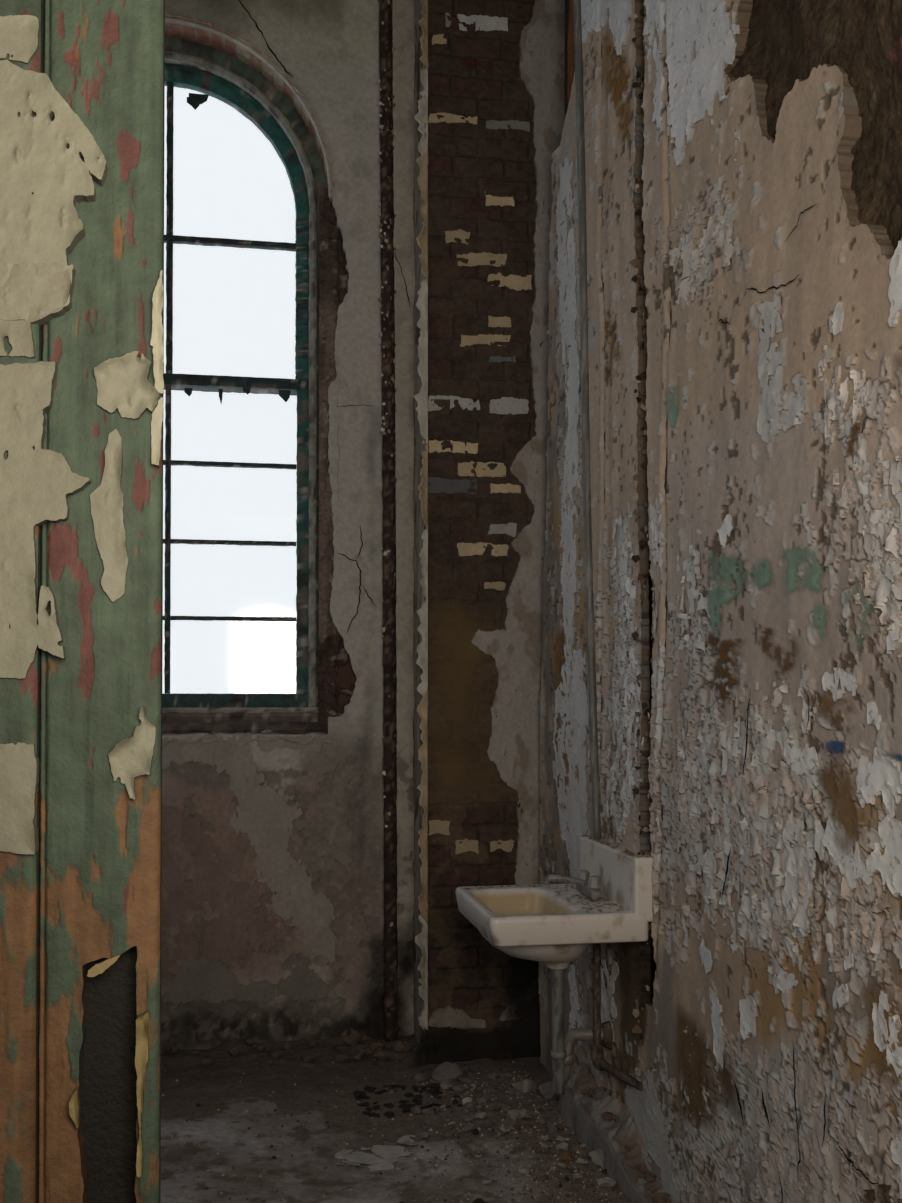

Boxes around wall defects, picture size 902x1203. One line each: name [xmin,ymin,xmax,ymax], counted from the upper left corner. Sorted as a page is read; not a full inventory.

crack [238,0,294,78]
peeling [0,15,164,679]
peeling [379,173,397,457]
peeling [108,196,356,963]
crack [336,527,377,634]
peeling [413,0,902,1091]
peeling [0,742,39,854]
peeling [87,954,121,977]
peeling [69,1086,80,1128]
peeling [135,1009,150,1177]
peeling [625,1058,902,1203]